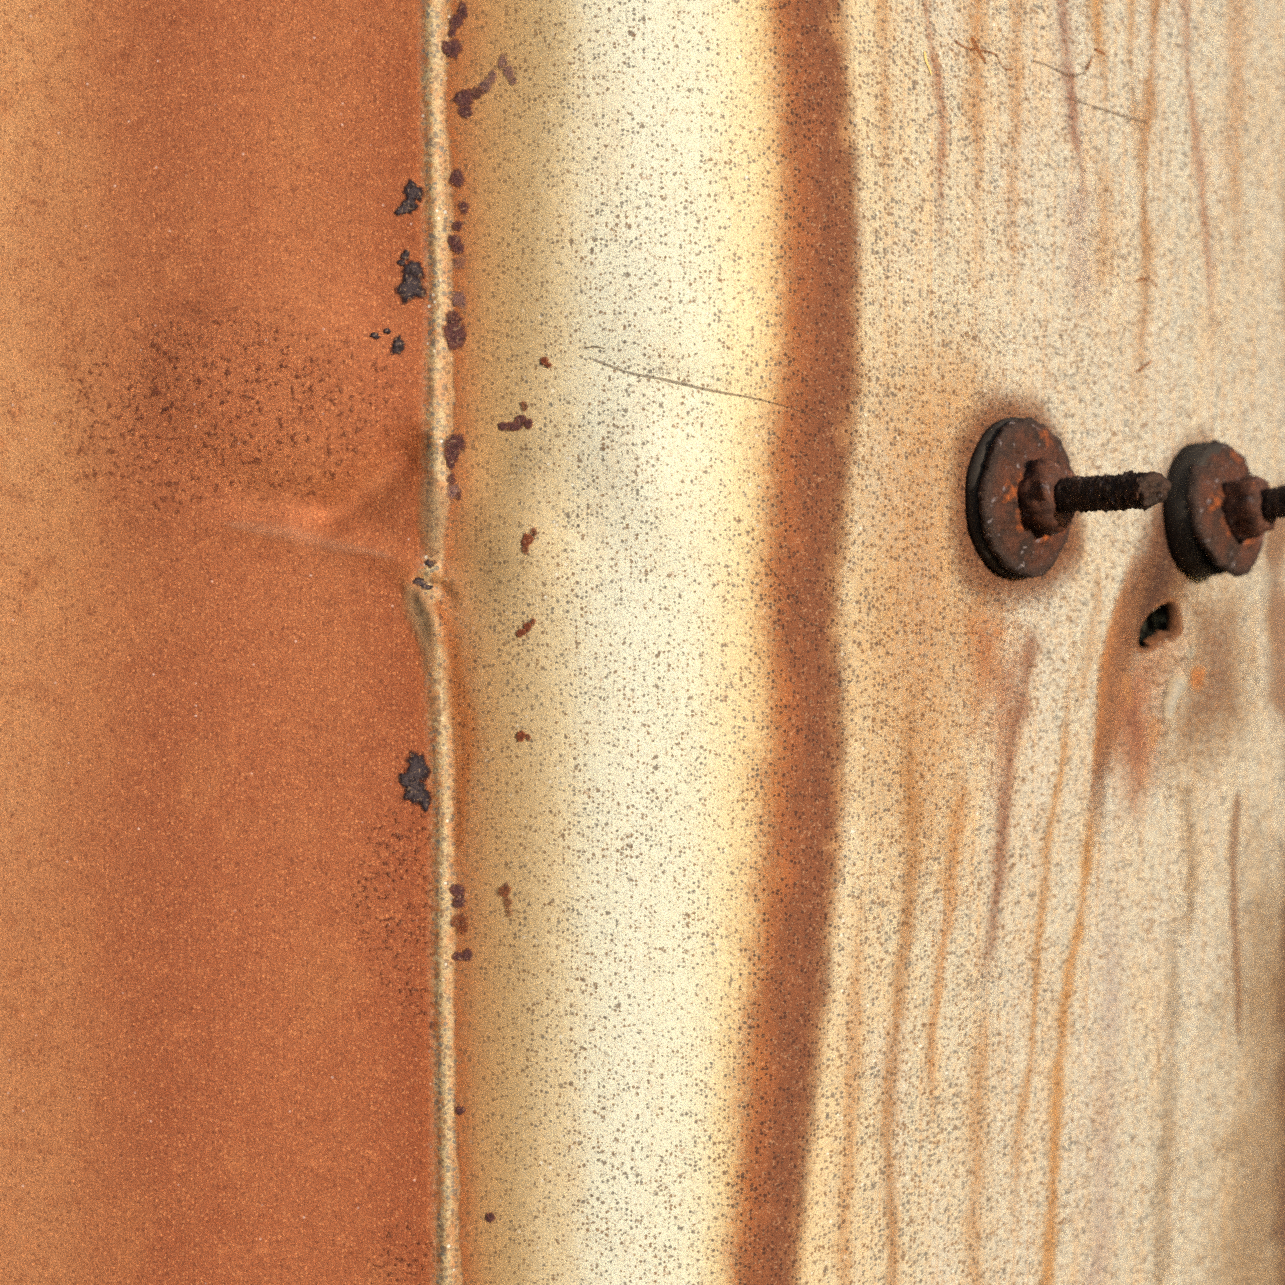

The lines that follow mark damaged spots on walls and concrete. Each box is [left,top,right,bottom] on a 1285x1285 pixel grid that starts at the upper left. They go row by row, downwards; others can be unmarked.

rust [394,179,424,216]
rust [395,249,427,305]
rust [370,328,406,355]
rust [1268,518,1285,569]
peeling [405,584,434,668]
rust [726,0,862,1285]
rust [1093,502,1247,800]
rust [1268,591,1285,712]
rust [399,750,433,813]
rust [874,372,1083,1285]
rust [1082,826,1093,896]
rust [1269,901,1285,1285]